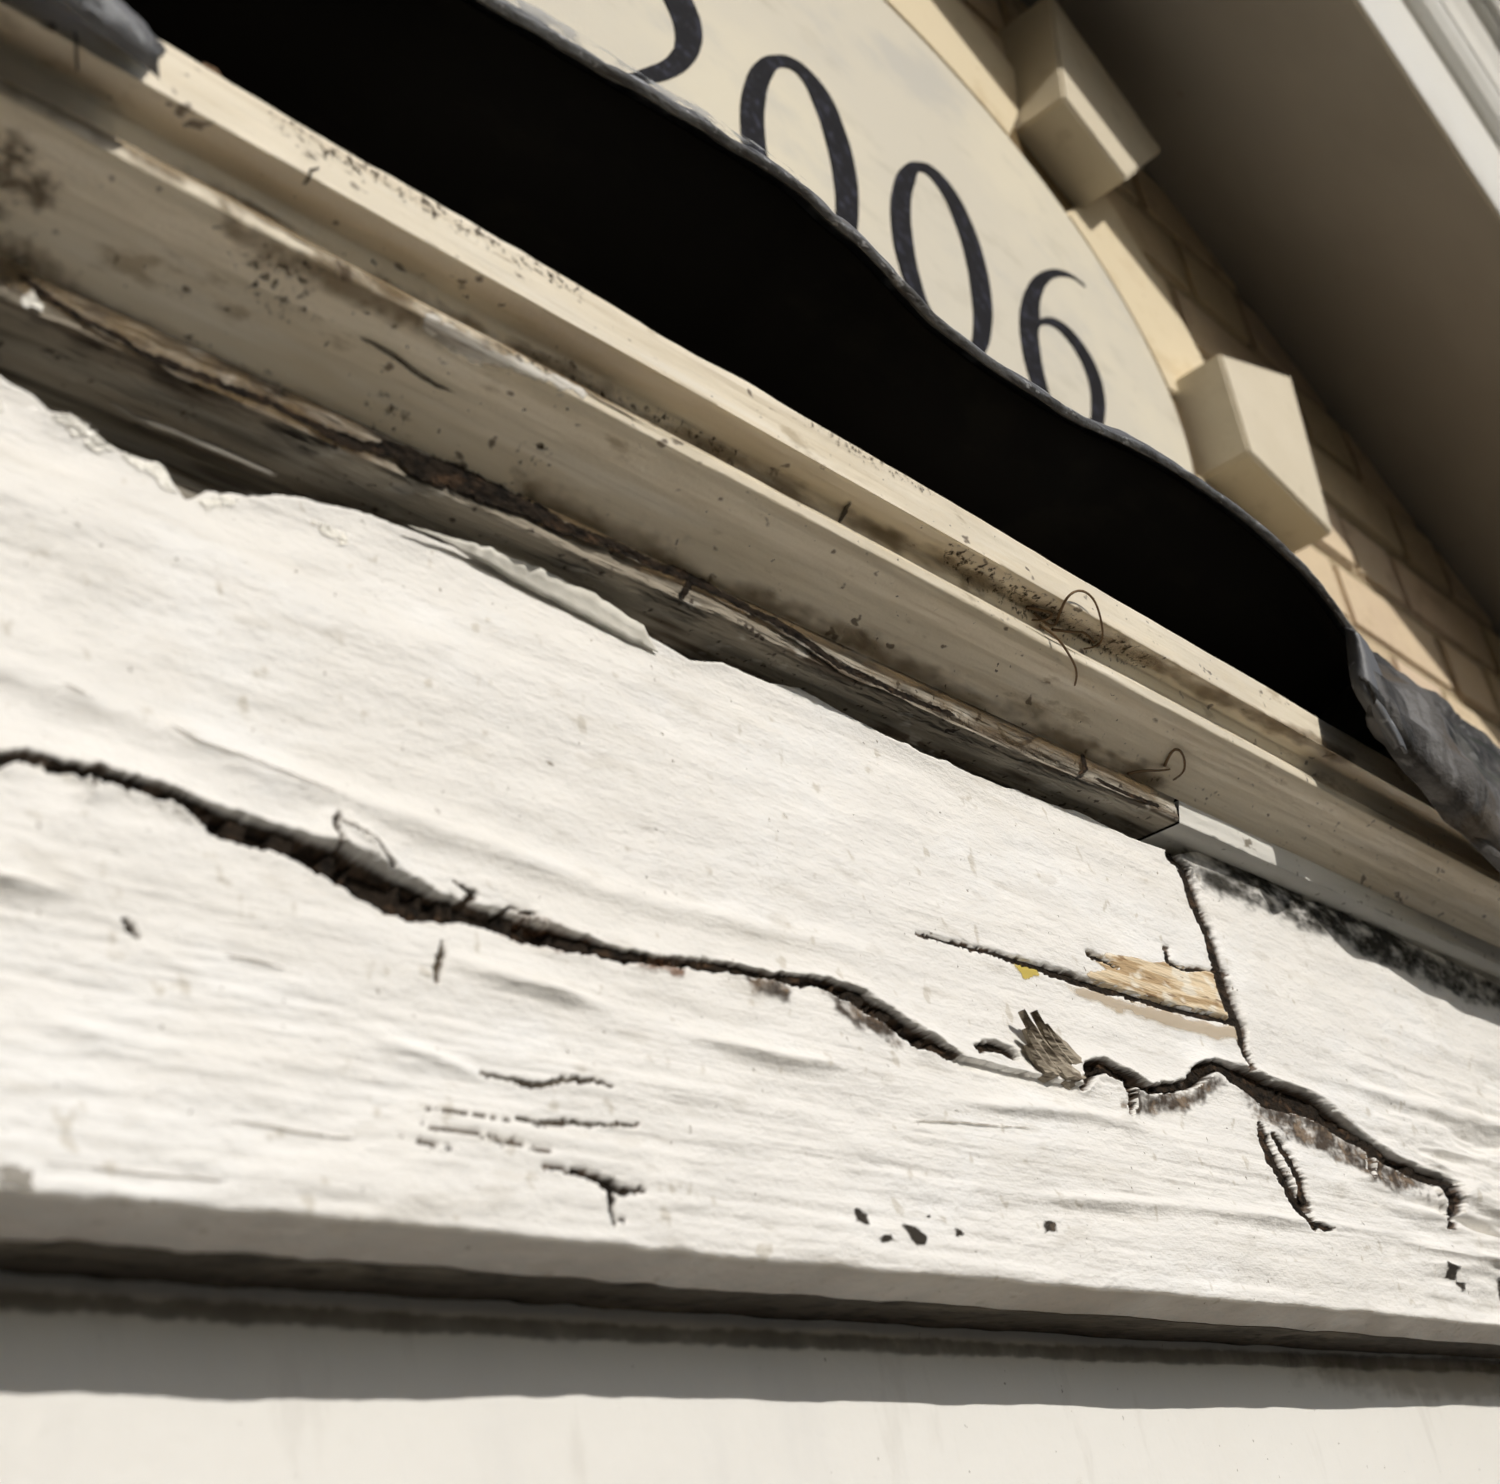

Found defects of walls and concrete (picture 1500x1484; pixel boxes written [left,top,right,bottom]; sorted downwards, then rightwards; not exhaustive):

water stain [313,259,421,324]
peeling [424,313,586,398]
peeling [53,413,177,493]
peeling [408,525,658,652]
water stain [734,591,1096,769]
crack [1078,754,1160,807]
water stain [1119,766,1160,794]
crack [0,726,1002,1054]
water stain [1182,849,1500,1006]
peeling [1076,953,1237,1039]
crack [918,854,1459,1230]
crack [417,1076,635,1223]